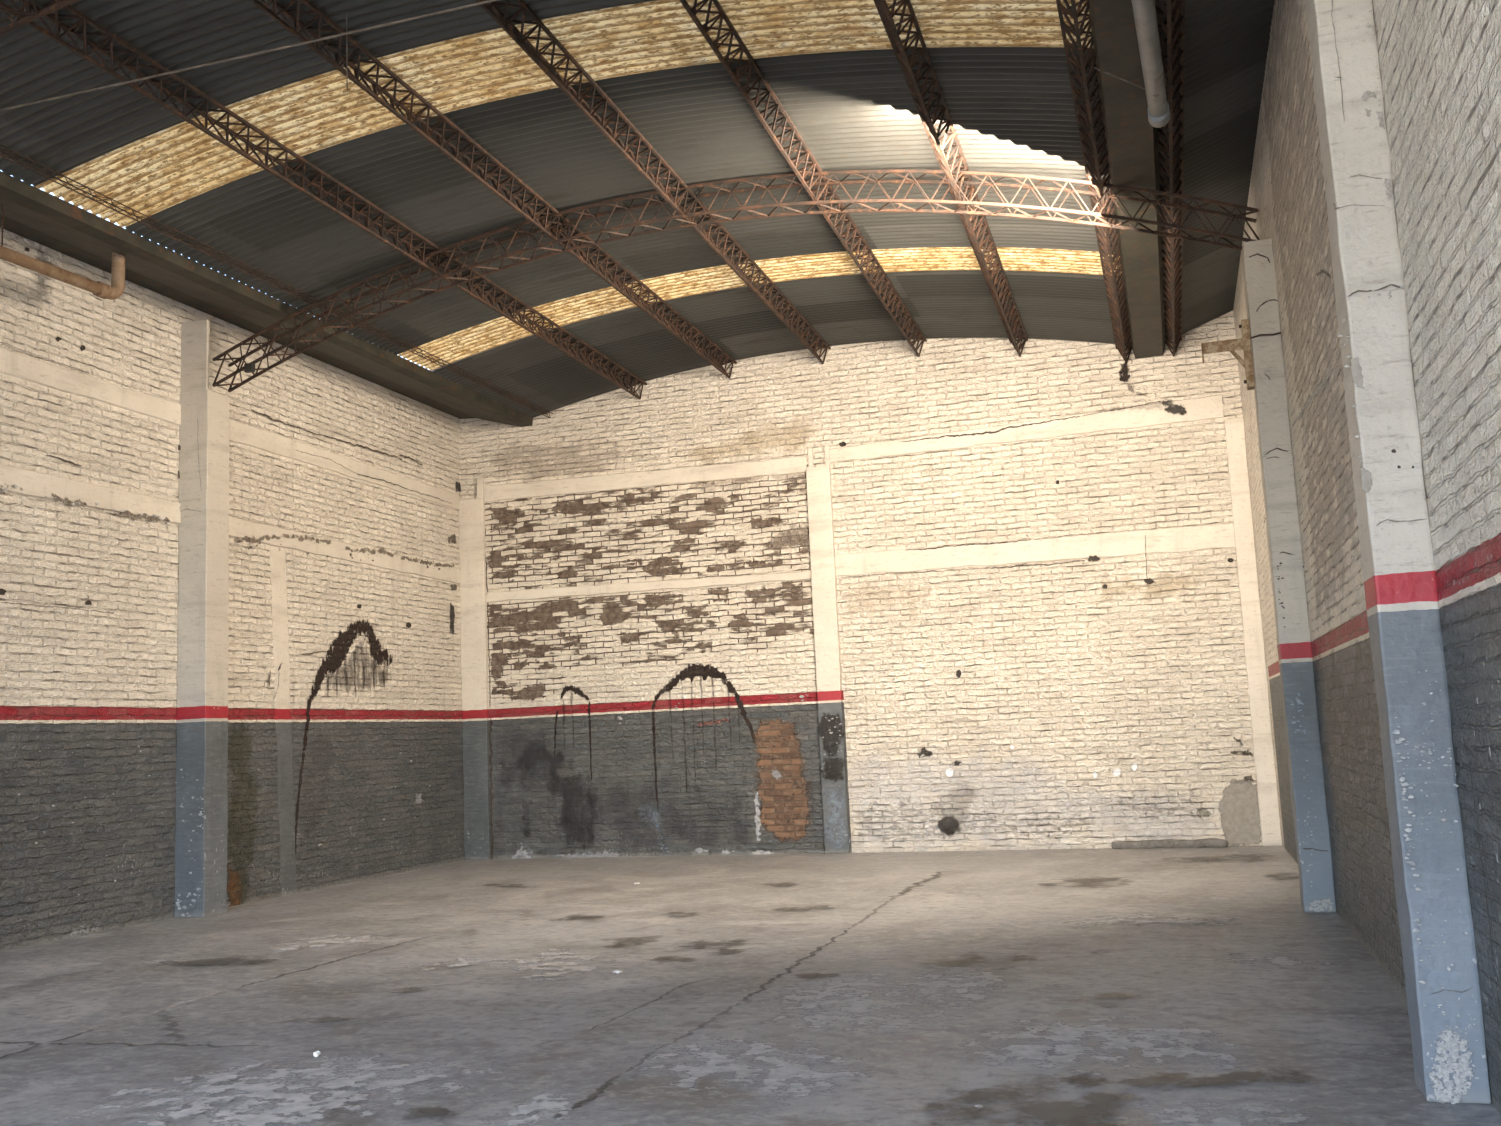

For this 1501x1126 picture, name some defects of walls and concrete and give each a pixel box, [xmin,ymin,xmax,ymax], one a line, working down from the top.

crack [47,455,81,466]
crack [1,602,113,614]
peeling [484,465,814,704]
damp [295,698,312,860]
damp [640,711,667,851]
flaking render [753,713,850,849]